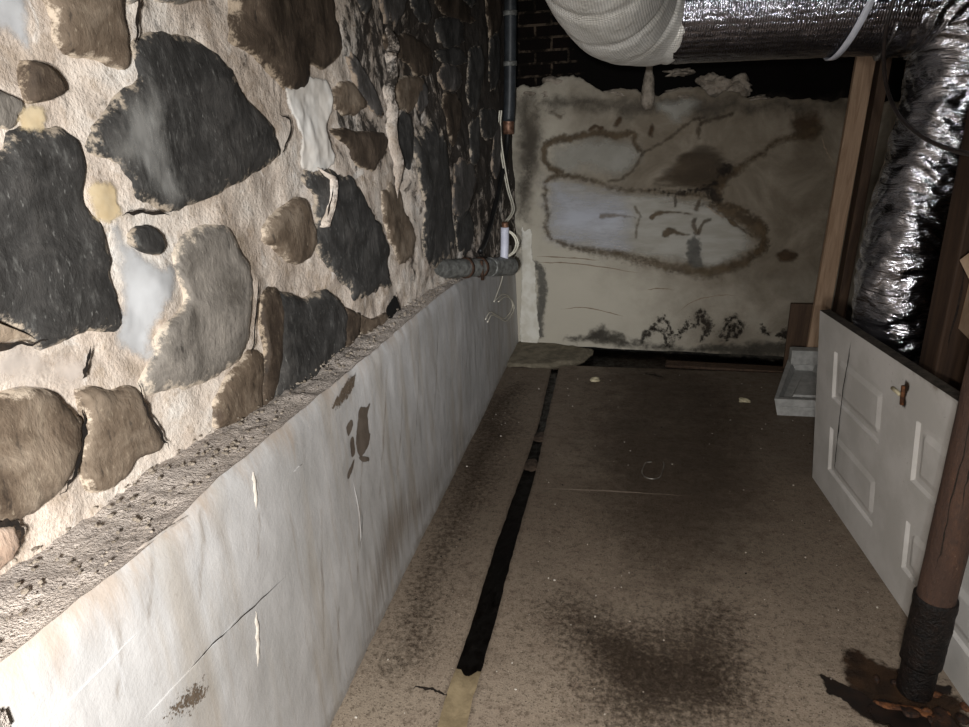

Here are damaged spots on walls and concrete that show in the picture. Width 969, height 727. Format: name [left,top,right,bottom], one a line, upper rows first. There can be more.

damp [519,100,822,276]
damp [573,309,787,358]
peeling [332,376,355,411]
crack [191,578,284,668]
flaking render [0,710,11,727]
damp [545,603,747,725]
corrosion [819,648,967,727]